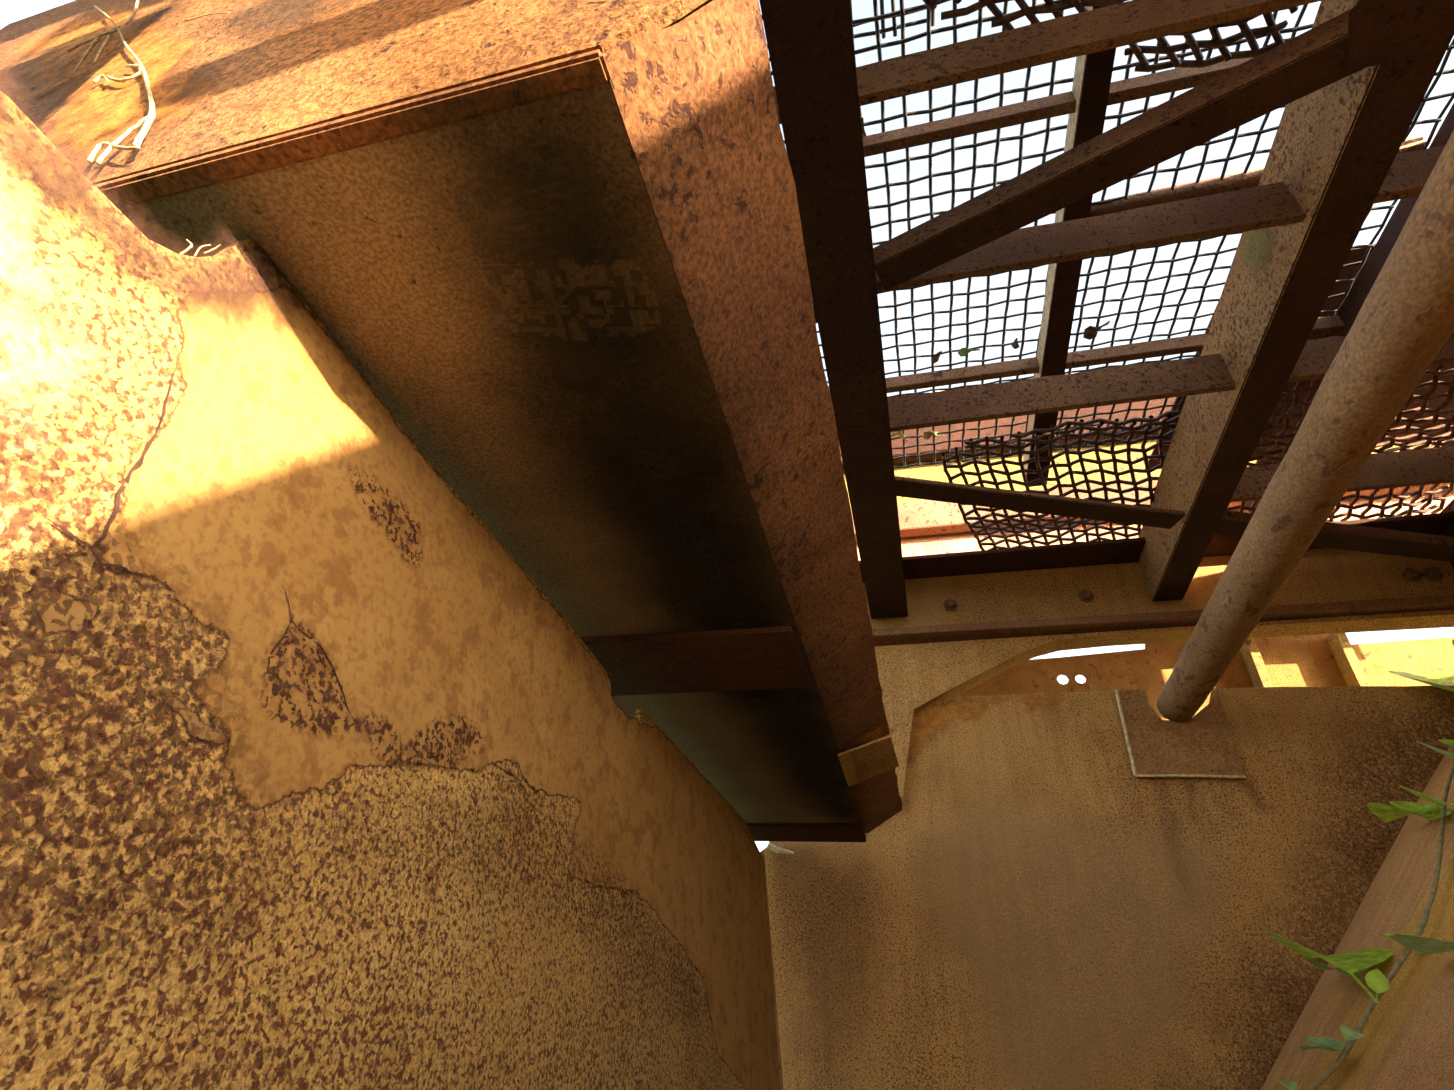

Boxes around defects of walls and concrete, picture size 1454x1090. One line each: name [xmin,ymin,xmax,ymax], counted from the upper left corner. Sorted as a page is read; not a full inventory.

corrosion [0,7,780,1090]
corrosion [908,694,1061,761]